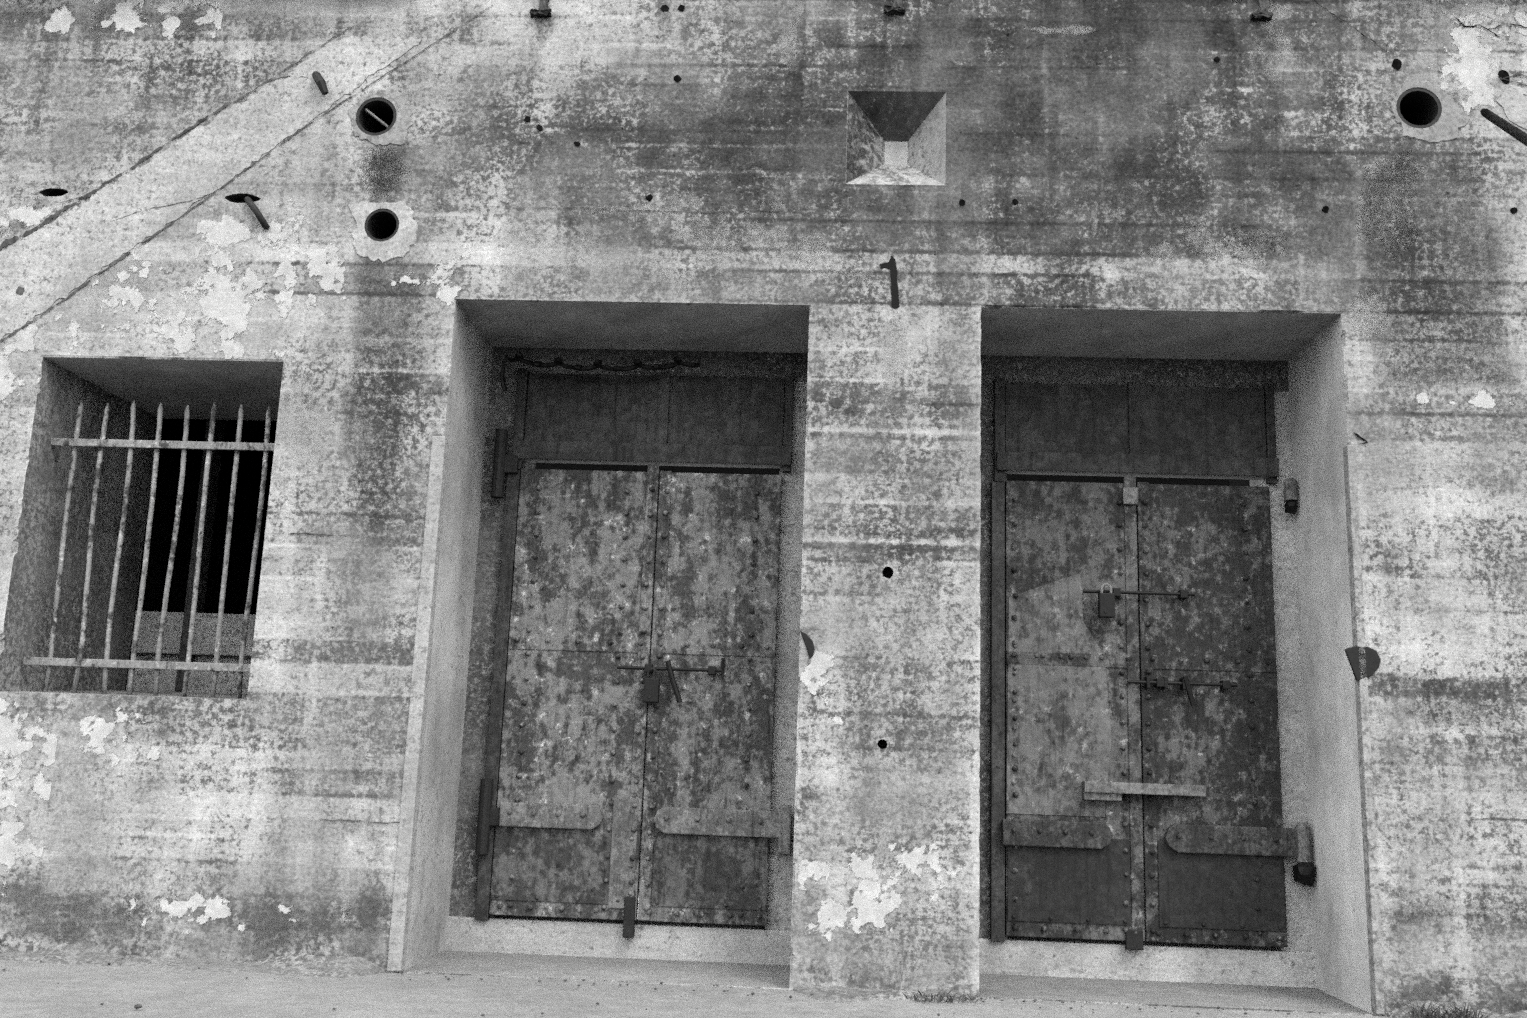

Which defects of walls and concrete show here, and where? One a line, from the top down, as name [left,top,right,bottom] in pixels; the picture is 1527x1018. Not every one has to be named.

peeling [28,4,75,34]
peeling [93,0,223,44]
crack [1314,0,1388,53]
peeling [1423,0,1527,115]
peeling [0,186,68,235]
peeling [55,193,346,359]
peeling [0,320,38,403]
peeling [79,707,145,767]
peeling [145,746,160,761]
peeling [0,697,57,896]
peeling [124,892,245,934]
peeling [798,843,962,942]